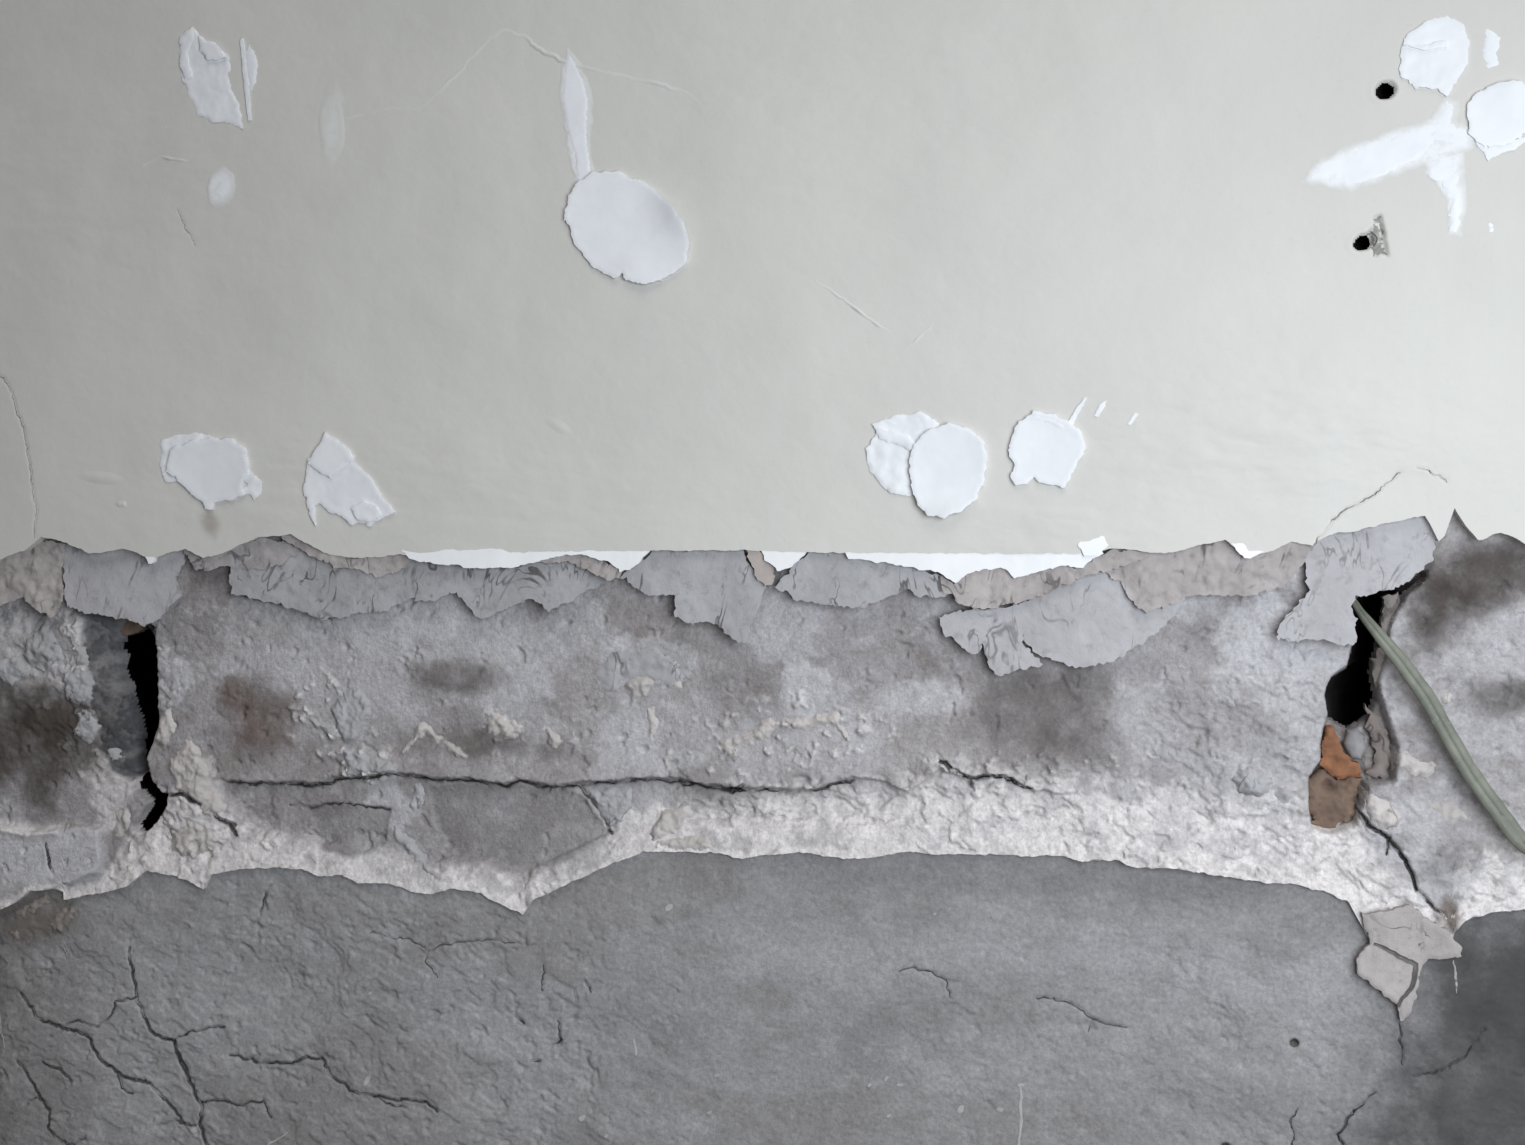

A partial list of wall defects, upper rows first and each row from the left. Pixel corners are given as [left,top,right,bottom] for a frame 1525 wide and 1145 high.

crack [1,376,37,538]
crack [230,773,854,835]
spalling [0,512,1525,1021]
crack [938,759,1031,789]
crack [16,947,438,1145]
crack [1399,1023,1483,1077]
crack [1336,1092,1376,1145]